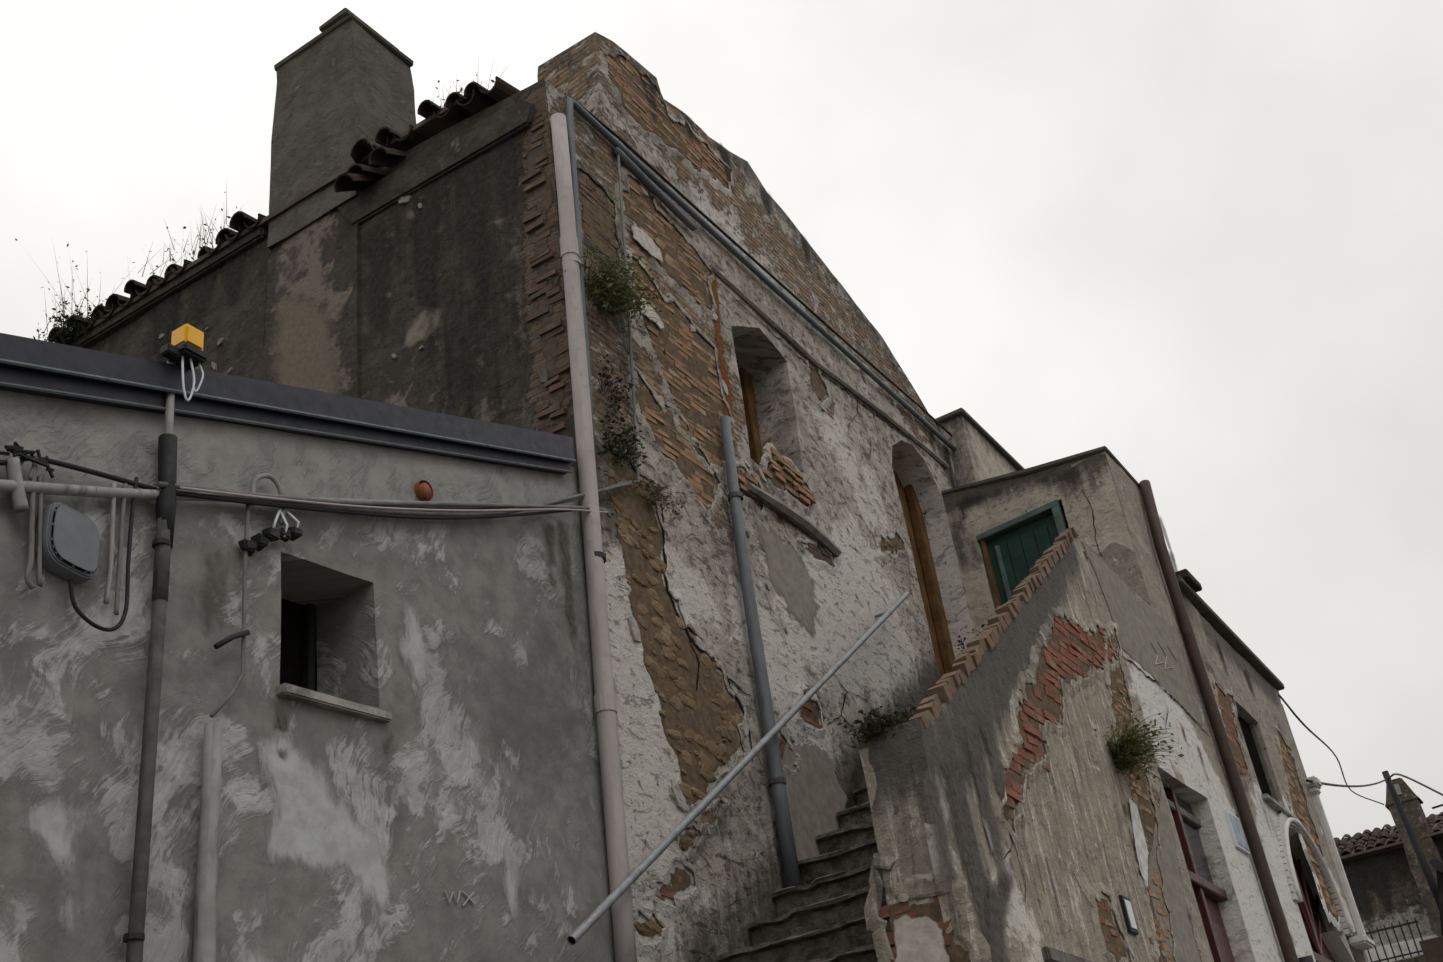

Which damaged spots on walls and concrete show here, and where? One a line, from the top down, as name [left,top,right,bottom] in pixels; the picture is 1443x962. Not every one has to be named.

spalling [599,45,736,198]
spalling [576,161,847,959]
spalling [994,541,1202,962]
spalling [1211,676,1251,787]
spalling [864,853,992,962]